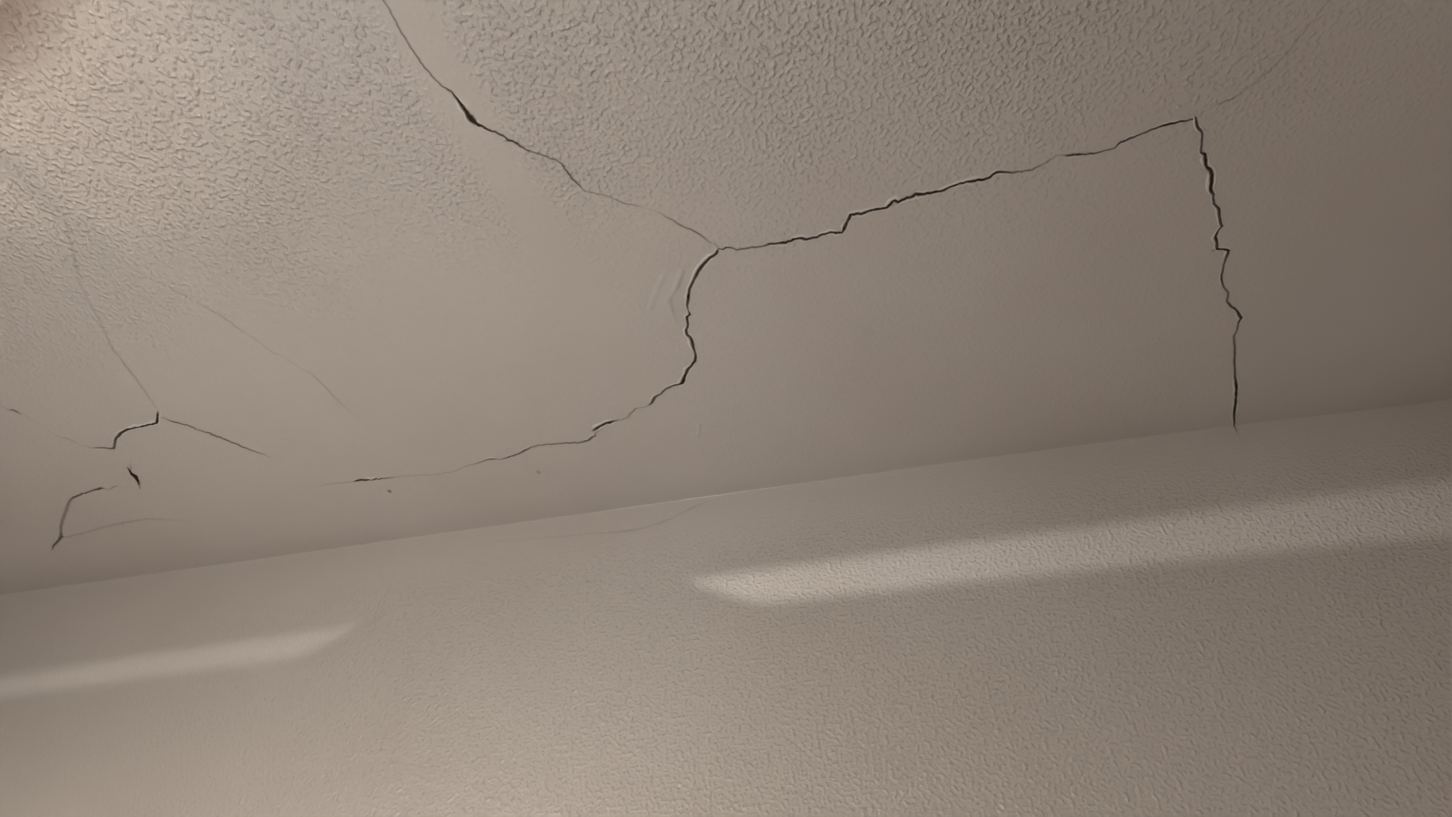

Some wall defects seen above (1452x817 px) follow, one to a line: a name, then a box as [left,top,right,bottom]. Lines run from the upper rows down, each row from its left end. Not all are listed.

crack [446,88,528,151]
crack [650,169,1016,405]
crack [1066,117,1245,427]
crack [102,410,248,449]
crack [566,419,616,444]
crack [486,446,530,460]
crack [353,475,384,483]